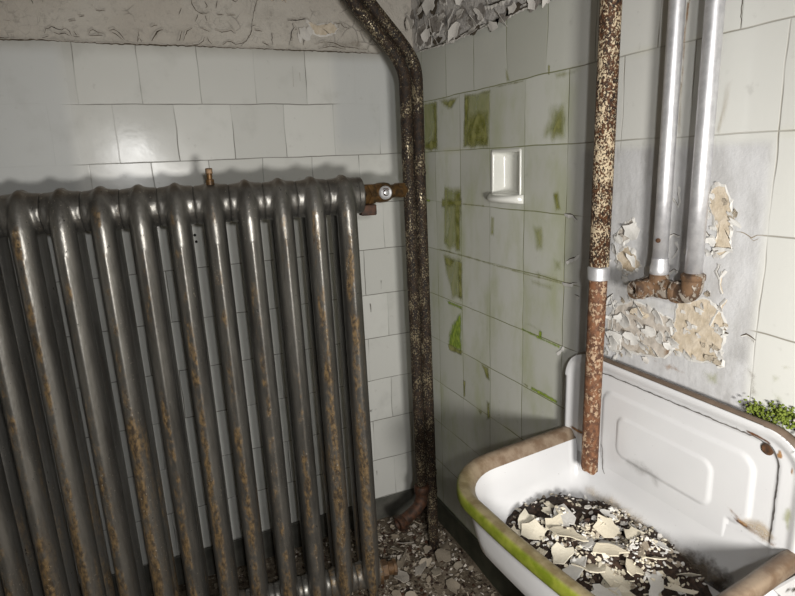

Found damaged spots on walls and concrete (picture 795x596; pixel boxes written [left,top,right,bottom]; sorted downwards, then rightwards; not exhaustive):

crack [0,0,379,54]
peeling [405,0,551,50]
peeling [611,217,649,284]
peeling [705,182,742,259]
peeling [604,291,728,367]